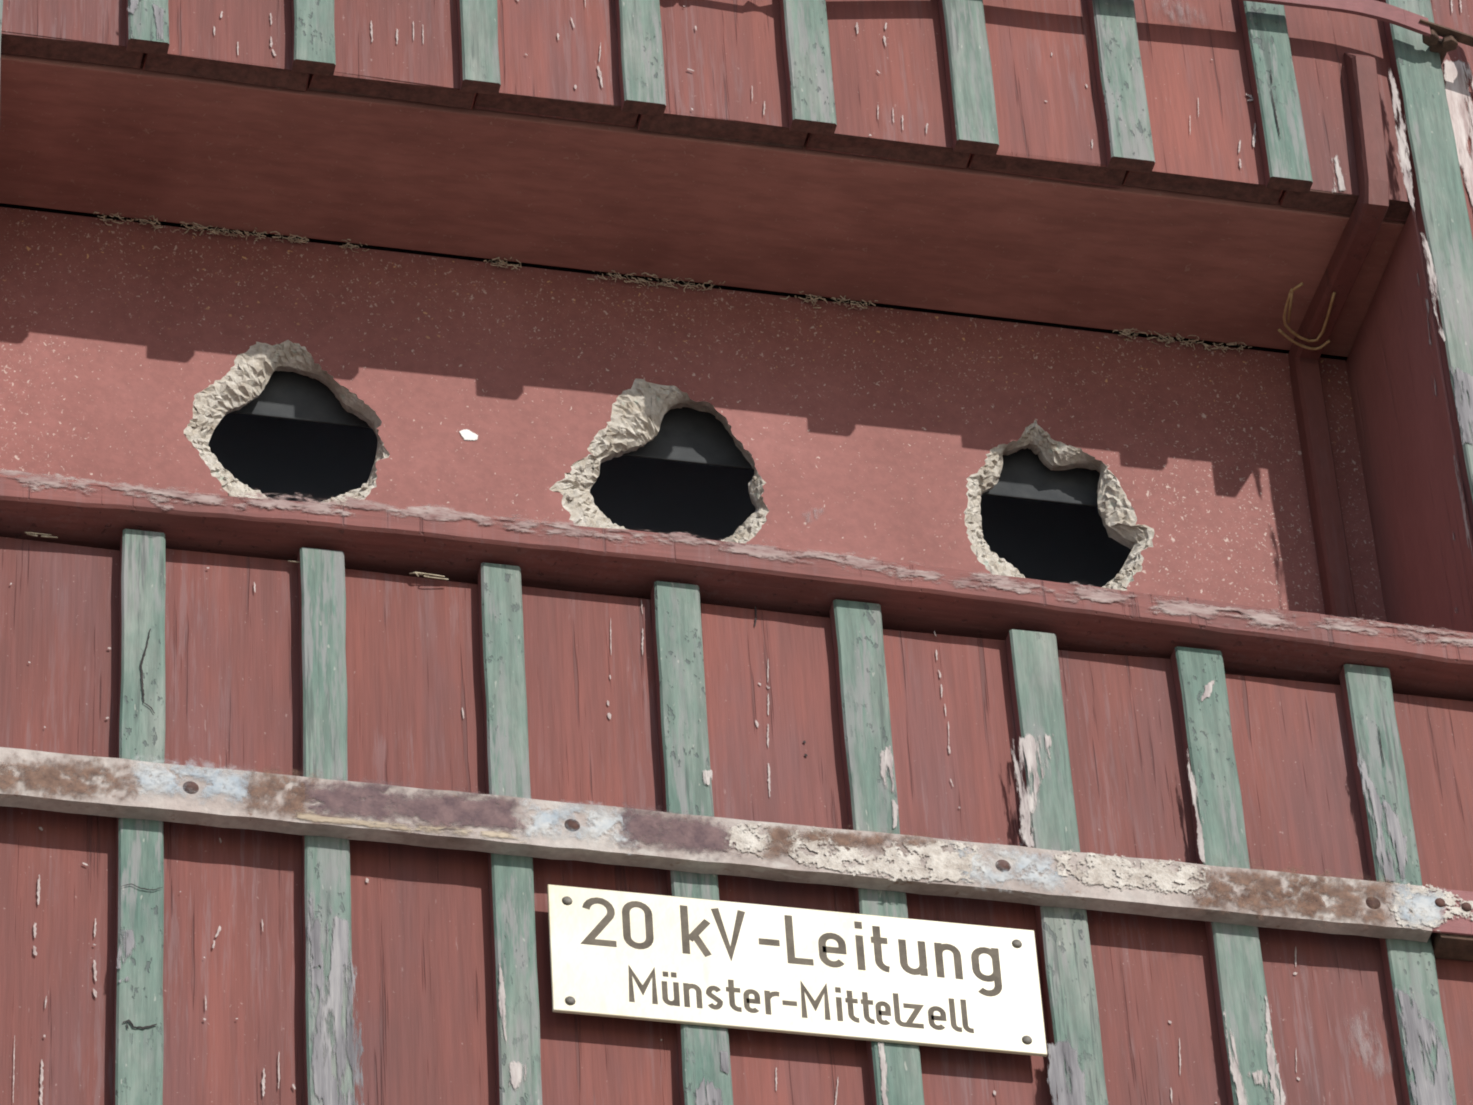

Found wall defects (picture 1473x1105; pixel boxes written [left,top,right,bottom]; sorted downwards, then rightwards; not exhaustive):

peeling [1389,71,1414,209]
peeling [1417,233,1445,346]
spalling [0,340,1154,603]
peeling [1431,366,1473,551]
peeling [1152,600,1473,647]
rust [0,761,137,798]
rust [246,771,526,831]
rust [622,804,734,853]
rust [765,826,936,857]
peeling [1013,733,1052,847]
rust [1197,869,1391,922]
peeling [307,893,364,1105]